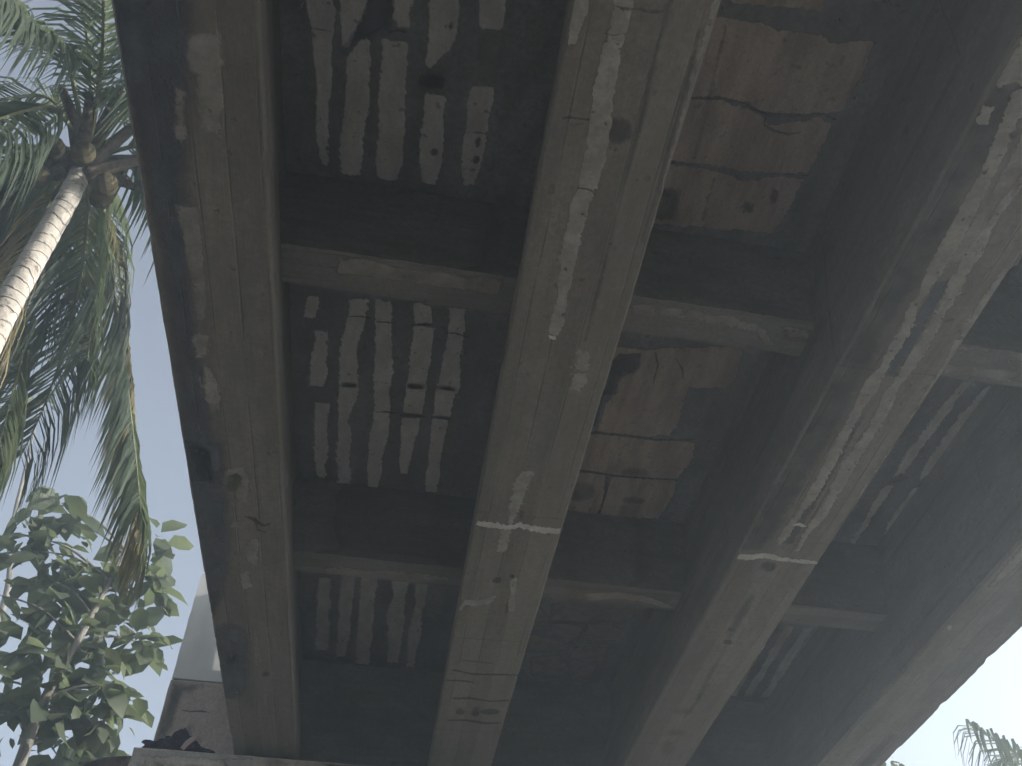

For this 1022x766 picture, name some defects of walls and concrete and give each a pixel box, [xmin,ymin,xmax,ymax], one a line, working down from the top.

peeling [306,0,408,181]
peeling [418,93,447,185]
peeling [425,0,460,68]
peeling [460,86,494,186]
peeling [478,0,506,30]
peeling [548,0,634,340]
peeling [638,0,874,268]
crack [691,96,836,135]
peeling [777,36,1022,552]
peeling [303,296,466,493]
peeling [568,346,743,519]
peeling [314,576,428,667]